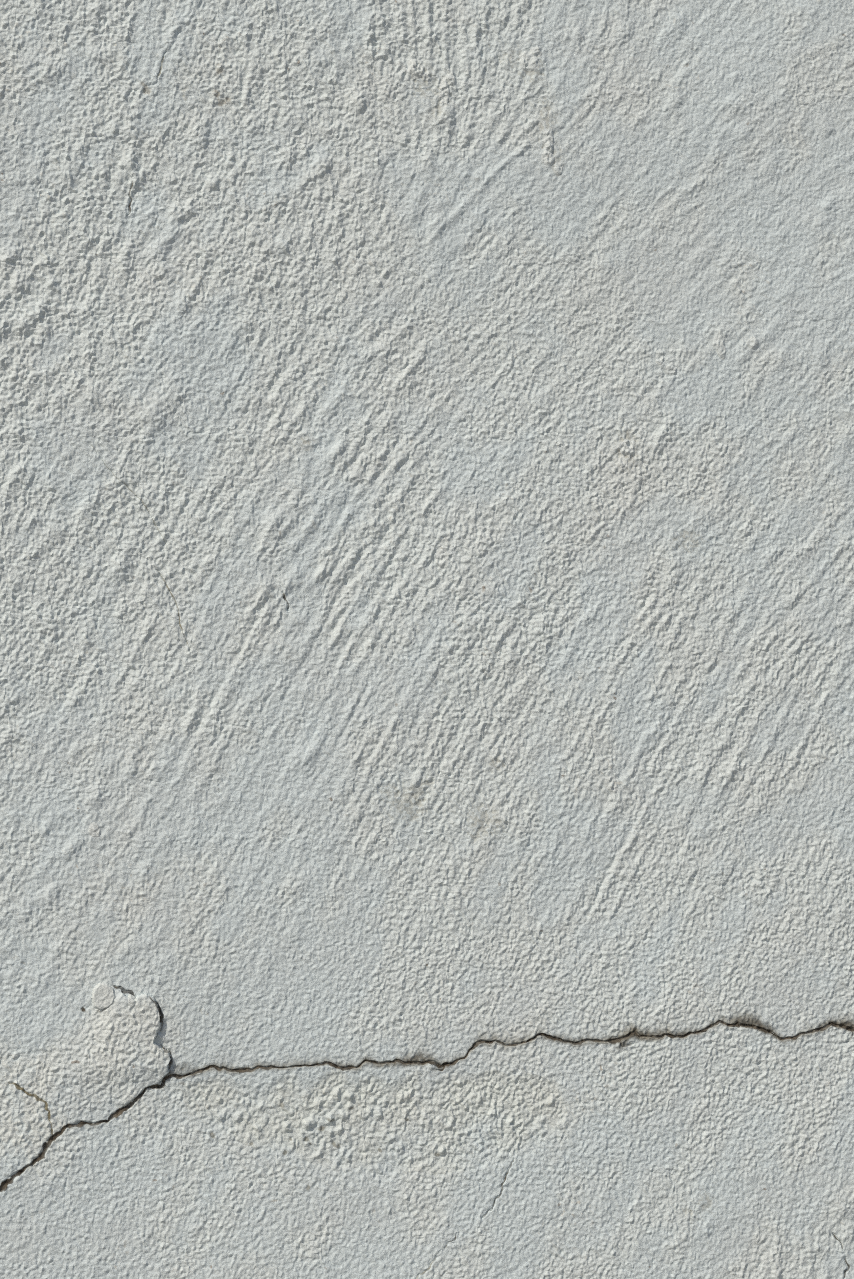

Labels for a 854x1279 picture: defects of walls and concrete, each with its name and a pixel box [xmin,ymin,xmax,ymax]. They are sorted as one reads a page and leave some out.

crack [0,1020,854,1192]